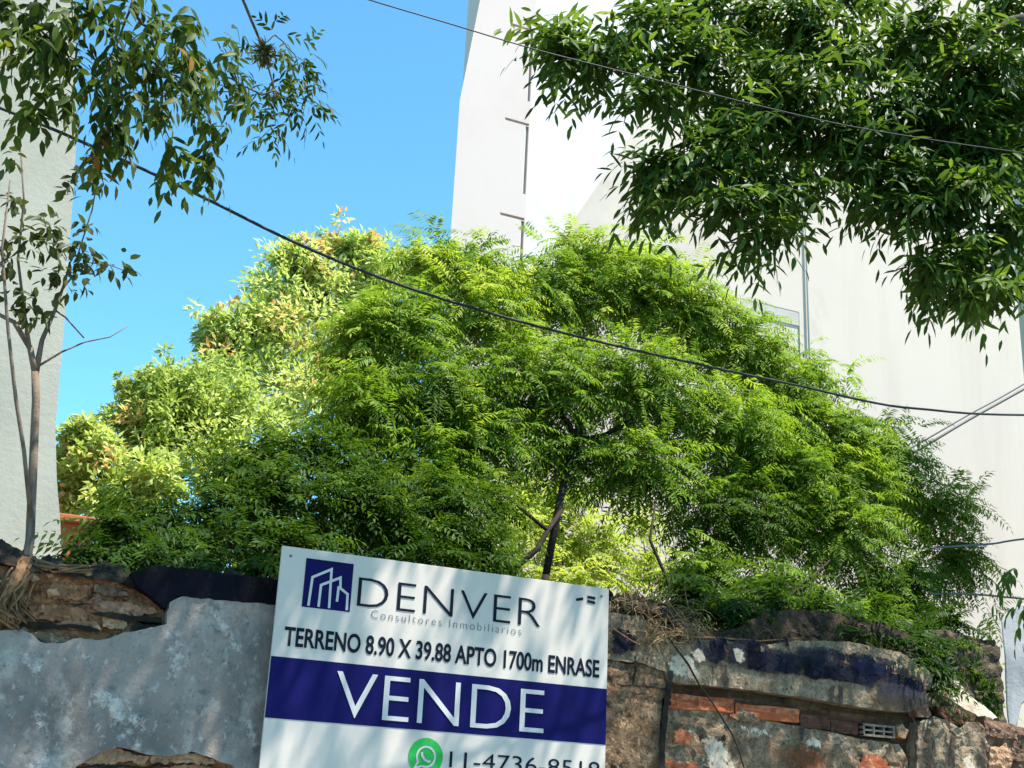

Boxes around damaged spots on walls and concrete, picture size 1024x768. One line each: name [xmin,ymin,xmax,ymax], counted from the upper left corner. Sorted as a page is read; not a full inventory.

spalling [0,571,164,643]
peeling [612,627,636,655]
peeling [706,636,1024,768]
spalling [673,727,691,744]
spalling [76,748,231,768]
spalling [666,759,700,768]